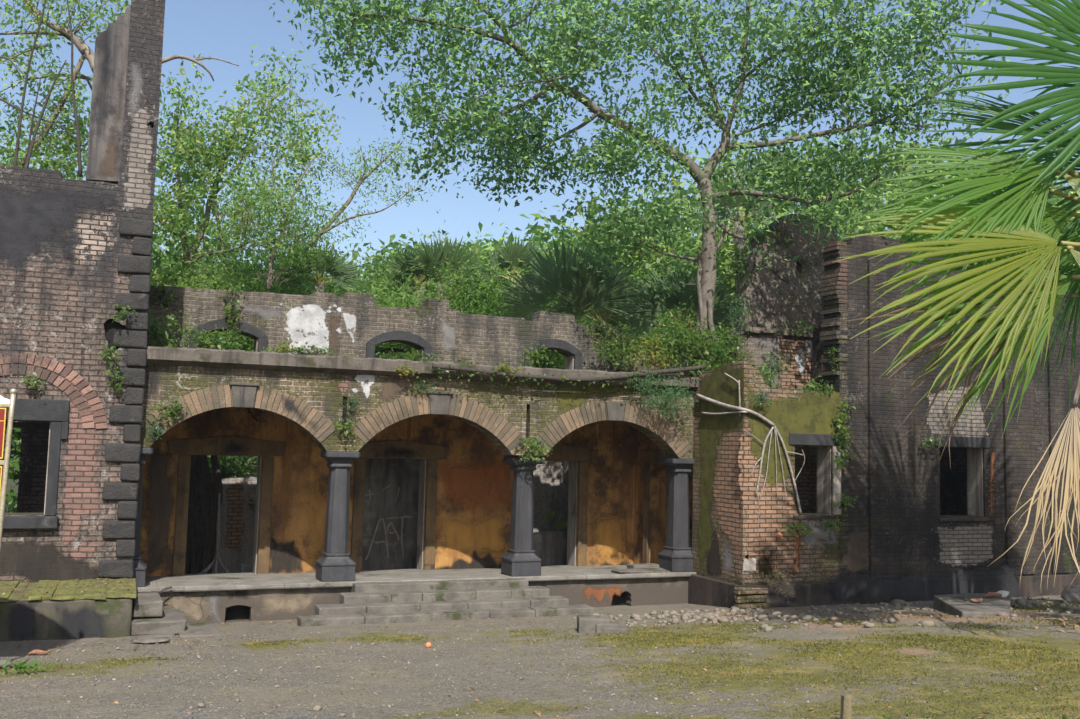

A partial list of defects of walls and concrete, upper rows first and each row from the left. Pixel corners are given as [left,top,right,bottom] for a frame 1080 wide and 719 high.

peeling [279,303,356,354]
peeling [332,375,375,398]
flaking render [712,241,848,577]
flaking render [926,385,989,437]
water stain [147,449,175,573]
water stain [269,538,302,573]
water stain [435,551,501,570]
flaking render [931,524,993,567]